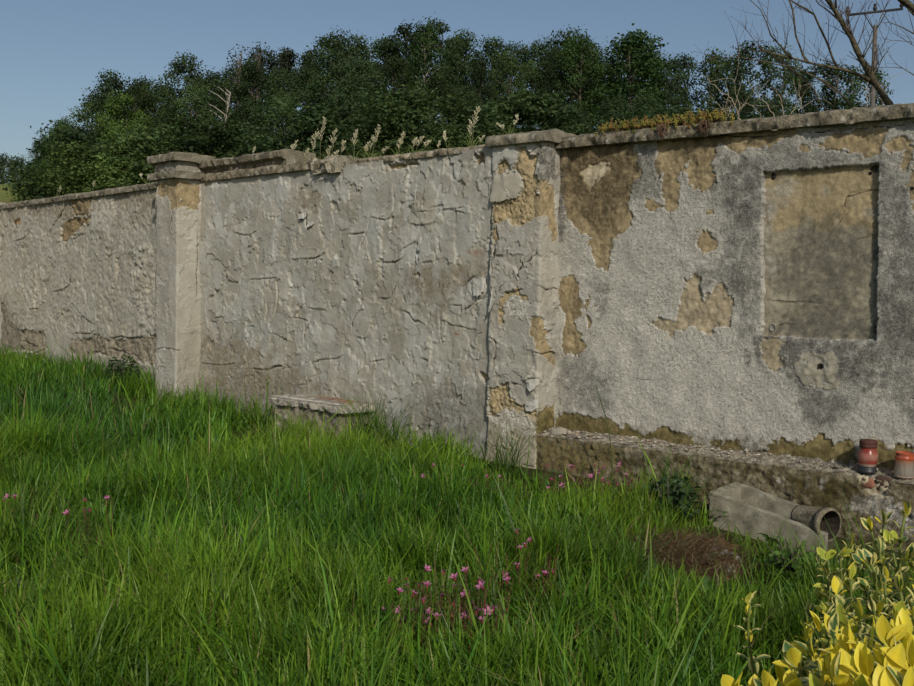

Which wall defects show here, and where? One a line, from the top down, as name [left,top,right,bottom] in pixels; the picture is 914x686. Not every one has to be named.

peeling [157,179,200,211]
crack [353,172,462,300]
peeling [476,142,643,272]
water stain [673,135,793,312]
peeling [644,124,914,218]
crack [705,122,914,153]
crack [78,312,179,355]
crack [406,248,557,360]
peeling [529,275,595,366]
spalling [648,273,734,338]
water stain [766,163,914,428]
peeling [757,433,859,464]